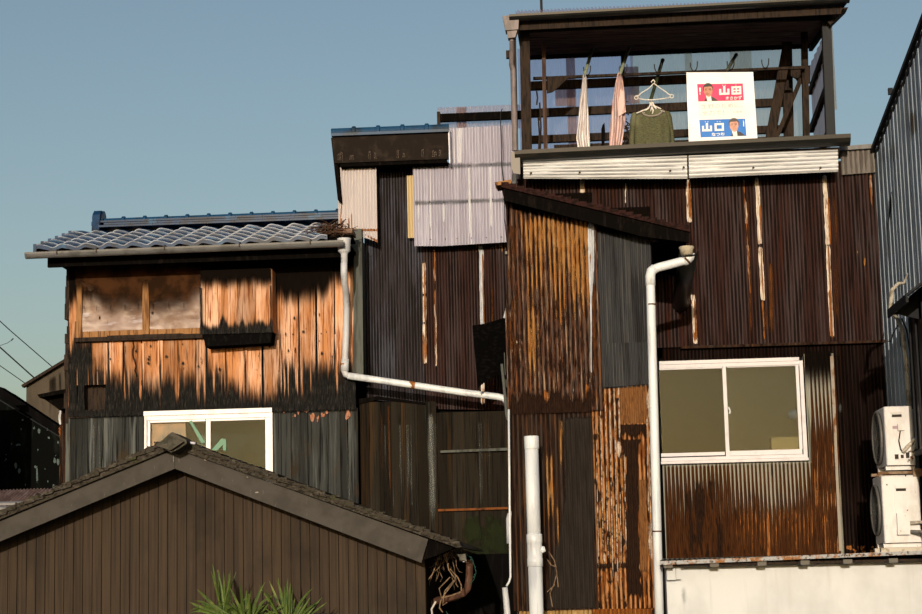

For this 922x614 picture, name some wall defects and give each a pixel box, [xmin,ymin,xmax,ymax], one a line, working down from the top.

corrosion [476,213,593,375]
corrosion [594,454,625,604]
corrosion [604,384,647,435]
corrosion [665,351,877,559]